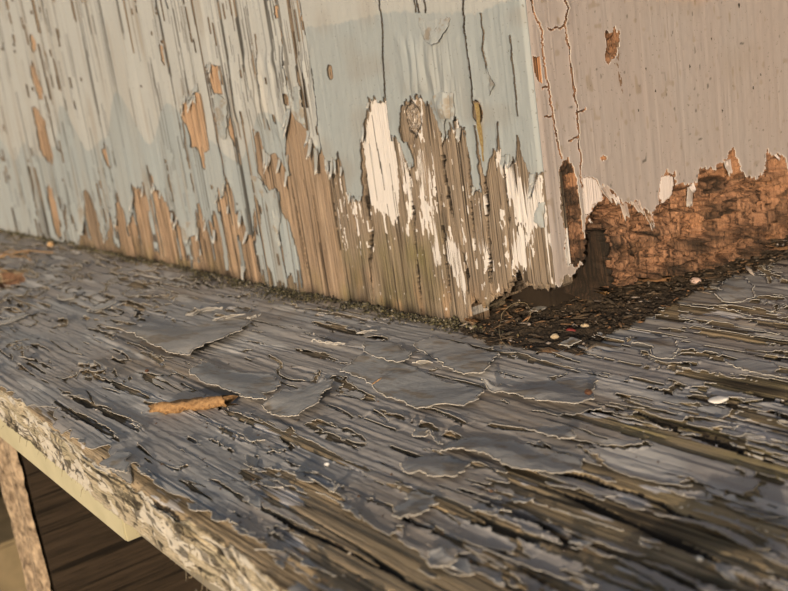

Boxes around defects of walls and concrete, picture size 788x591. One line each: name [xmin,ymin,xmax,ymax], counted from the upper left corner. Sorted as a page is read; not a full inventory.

peeling [180,62,235,167]
peeling [76,86,573,325]
crack [530,0,584,186]
spalling [583,147,788,288]
peeling [0,306,788,591]